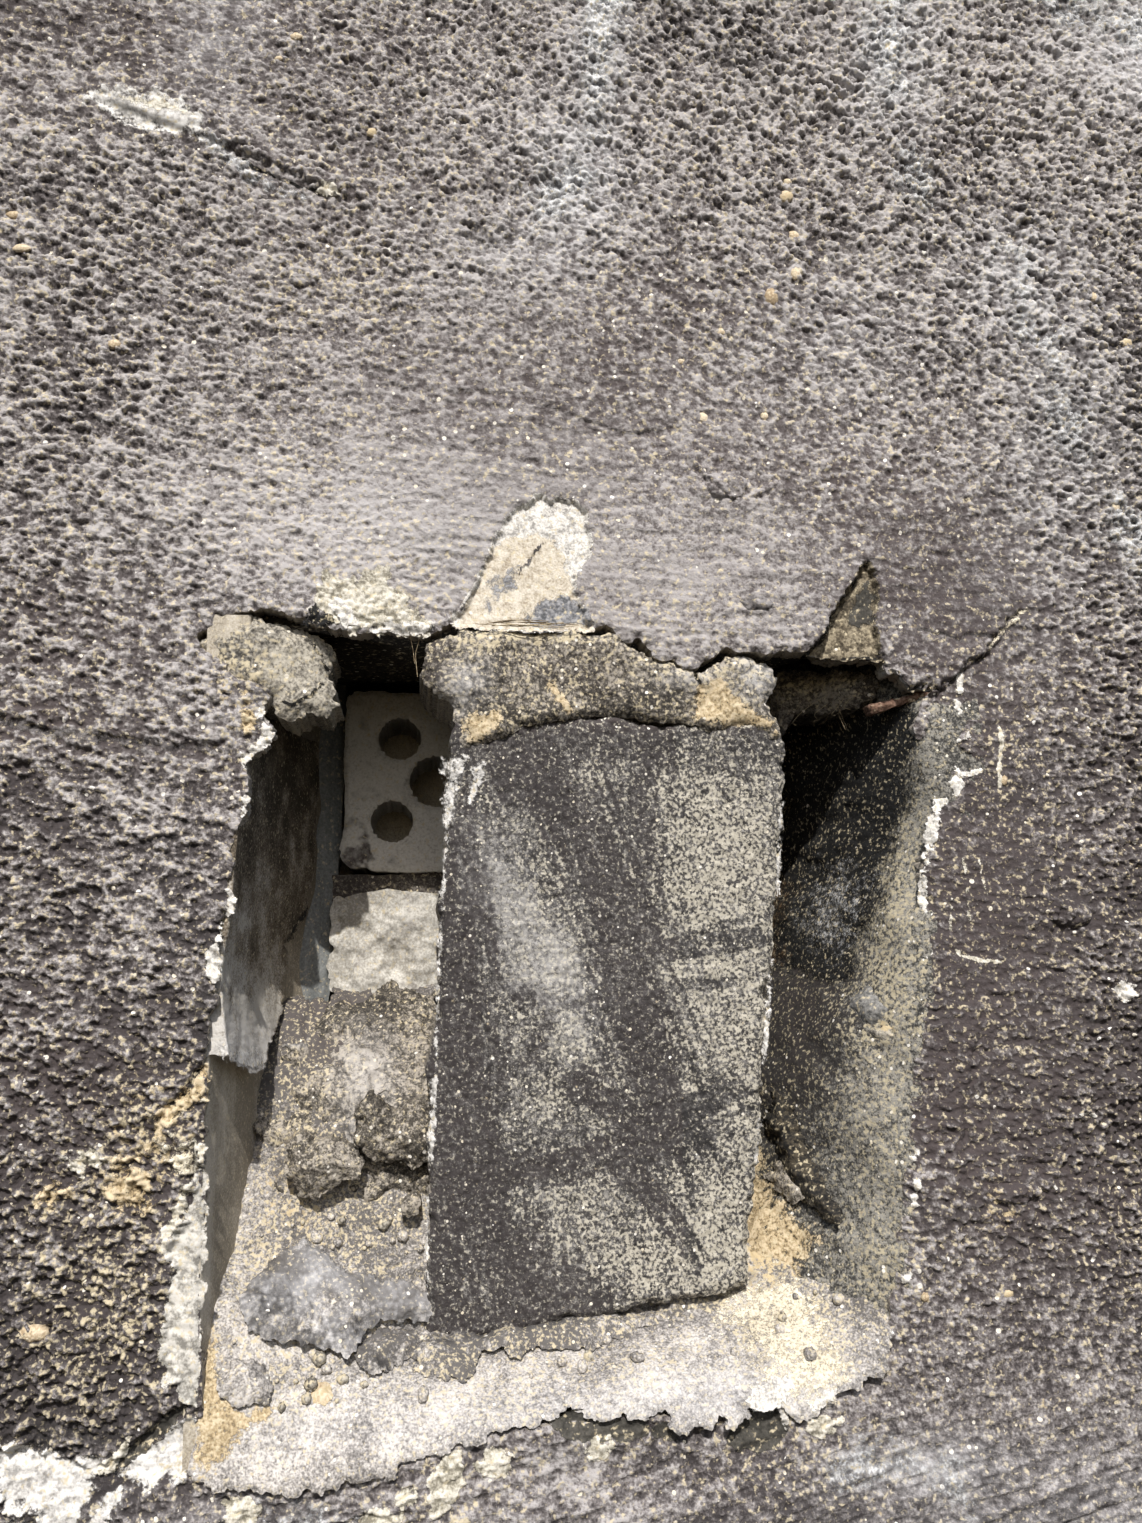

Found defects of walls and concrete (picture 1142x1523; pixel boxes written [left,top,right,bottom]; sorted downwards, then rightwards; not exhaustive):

crack [242,158,317,192]
spalling [311,493,596,639]
spalling [805,562,884,663]
crack [805,561,1027,693]
crack [694,669,702,711]
peeling [205,705,320,1074]
spalling [917,766,983,913]
spalling [326,754,489,1170]
spalling [219,1495,262,1523]
spalling [352,1446,515,1523]
spalling [549,1409,679,1462]
spalling [726,1375,845,1454]